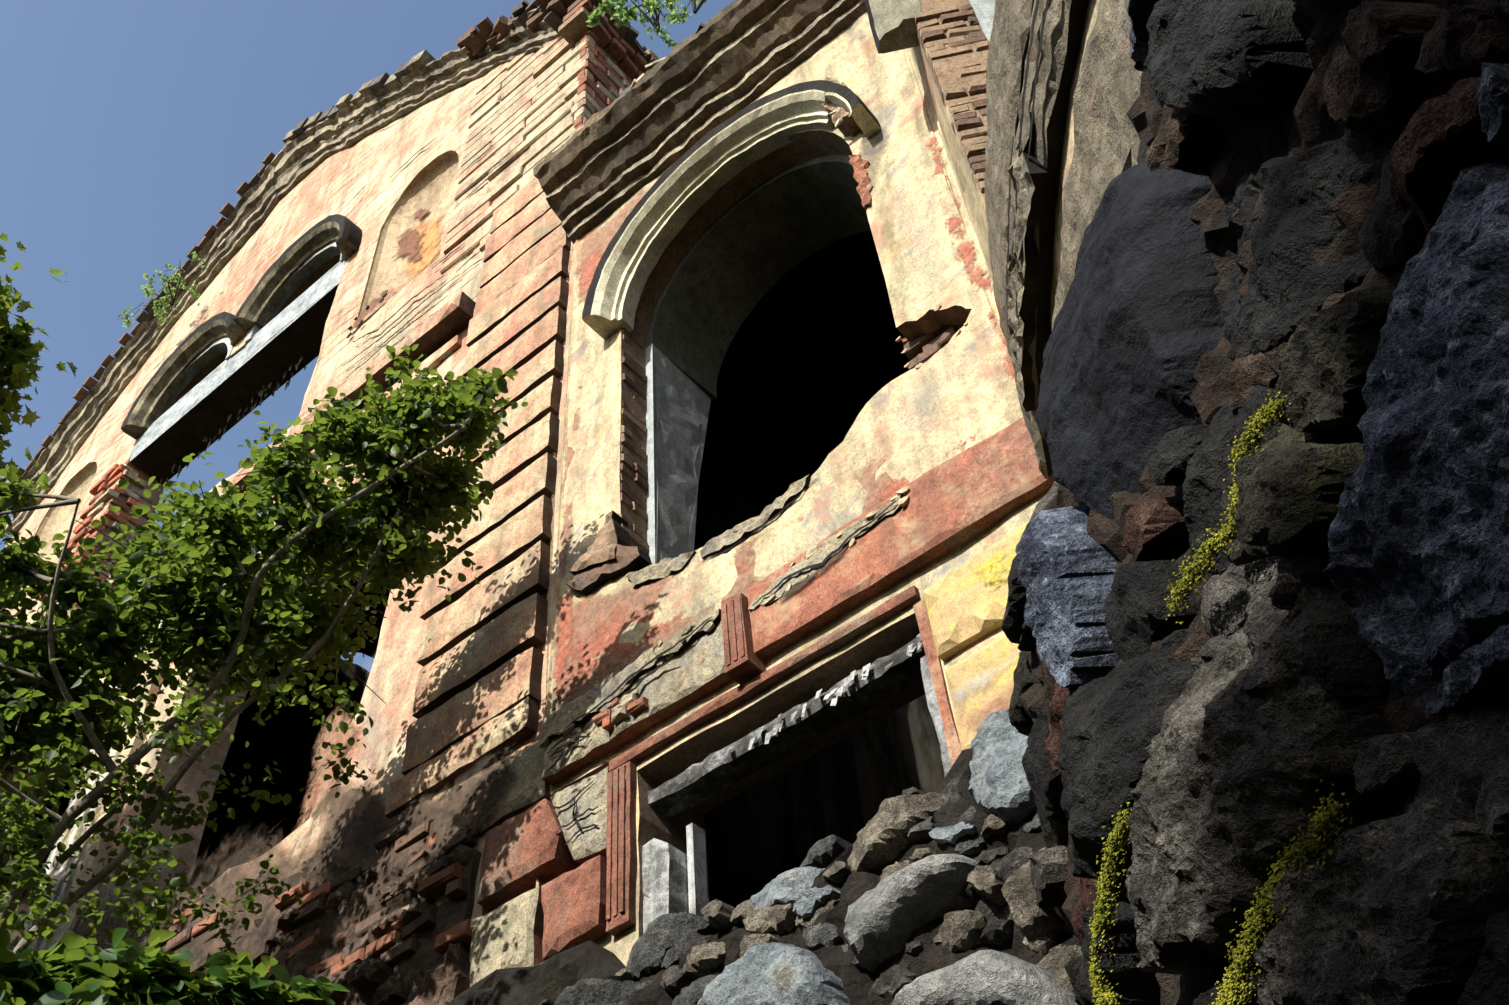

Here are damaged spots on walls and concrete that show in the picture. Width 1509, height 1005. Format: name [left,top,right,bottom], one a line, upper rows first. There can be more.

flaking render [346,19,711,366]
flaking render [821,101,873,210]
spalling [896,304,968,370]
flaking render [925,112,1048,412]
flaking render [36,459,153,619]
peeling [538,460,910,754]
crack [541,732,598,845]